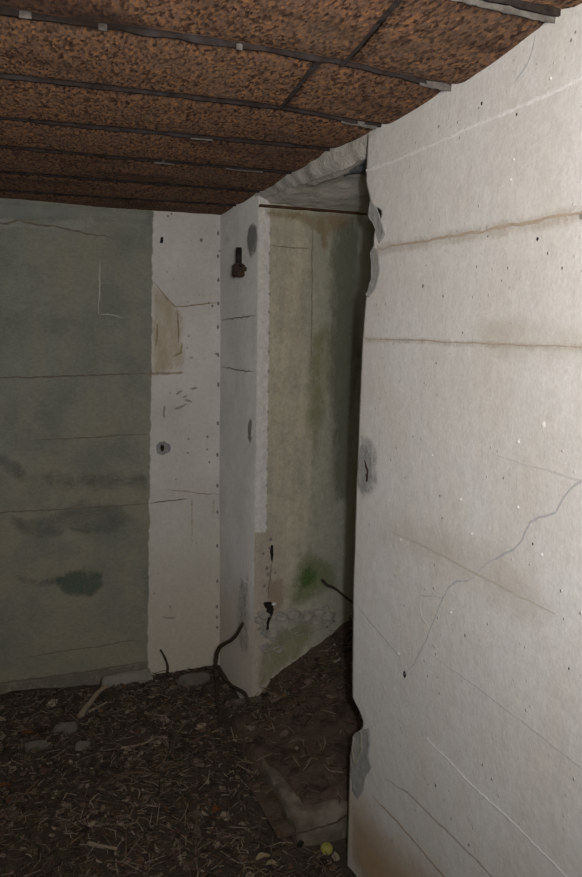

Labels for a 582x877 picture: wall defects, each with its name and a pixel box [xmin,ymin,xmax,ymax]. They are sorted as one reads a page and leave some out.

spalling [344,160,366,176]
rust [371,338,582,348]
damp [58,571,101,595]
crack [358,455,582,768]